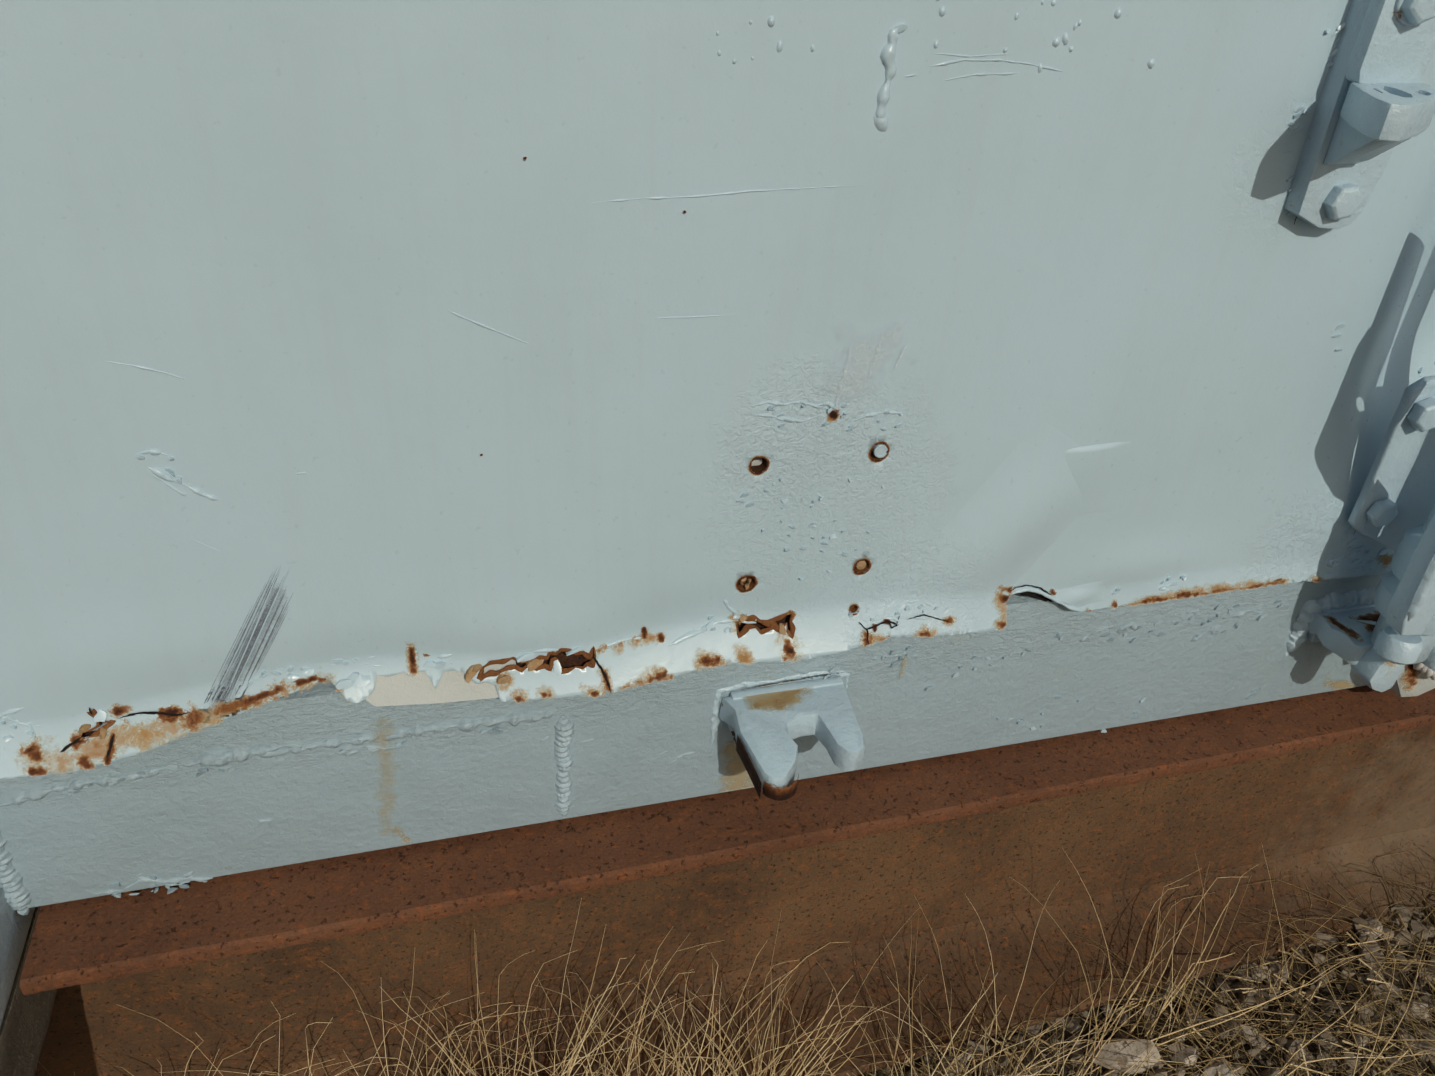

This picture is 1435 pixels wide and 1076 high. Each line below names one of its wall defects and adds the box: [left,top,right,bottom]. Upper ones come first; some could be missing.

corrosion [827,407,840,421]
peeling [668,600,757,646]
corrosion [996,585,1057,630]
corrosion [1111,578,1289,608]
peeling [247,656,381,690]
peeling [423,654,482,683]
peeling [516,635,642,675]
corrosion [588,627,673,697]
corrosion [696,648,754,667]
corrosion [783,640,796,661]
corrosion [746,683,805,710]
corrosion [19,675,341,776]